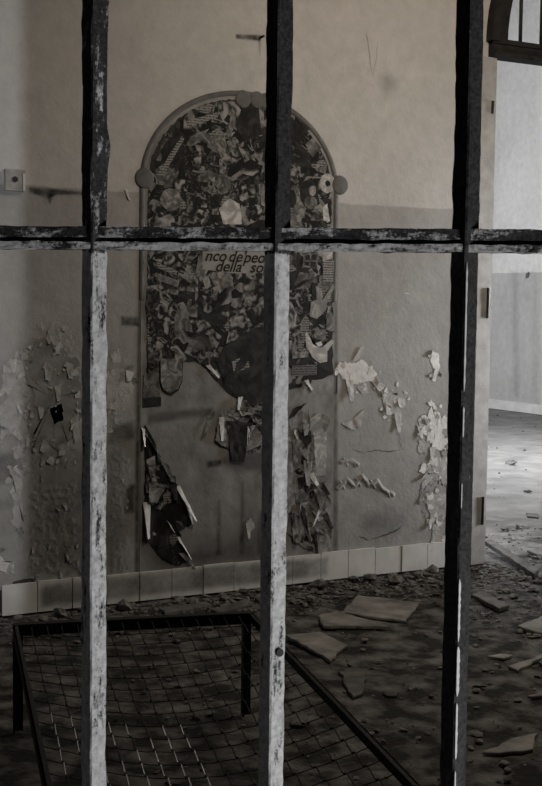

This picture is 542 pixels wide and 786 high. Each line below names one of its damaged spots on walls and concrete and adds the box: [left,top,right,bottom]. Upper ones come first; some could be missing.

peeling [0,326,82,535]
peeling [106,349,140,433]
spalling [0,547,35,613]